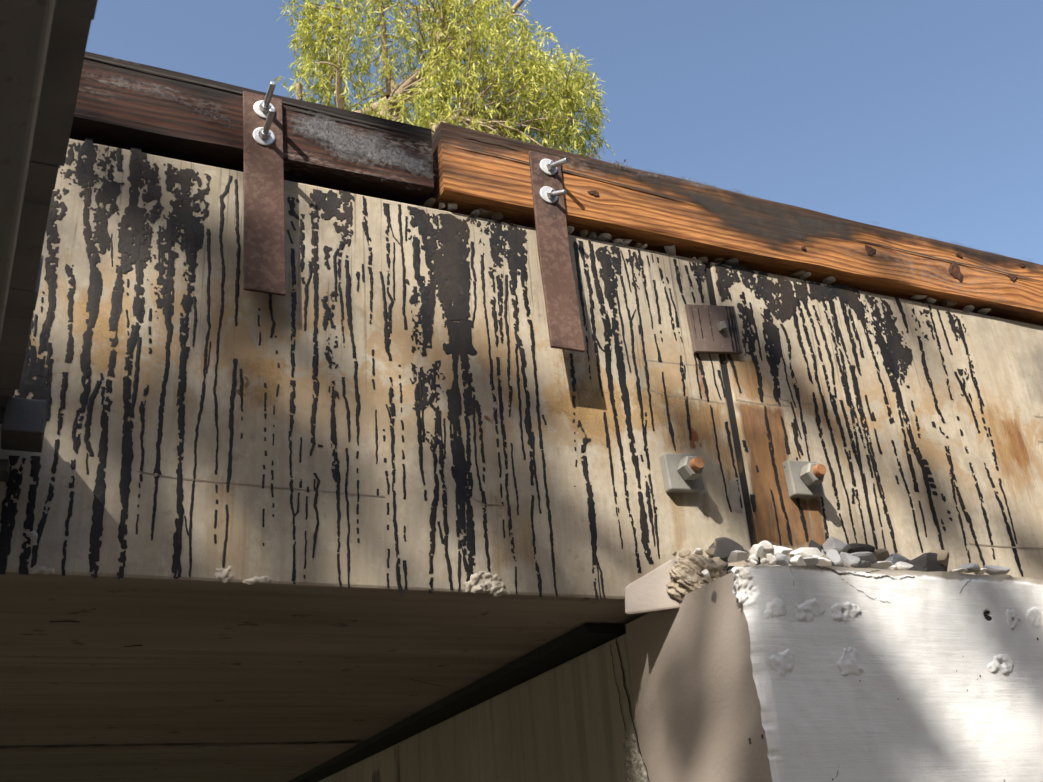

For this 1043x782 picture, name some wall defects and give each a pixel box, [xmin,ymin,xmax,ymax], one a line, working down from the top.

corrosion [677,394,714,448]
corrosion [991,416,1029,479]
spalling [215,565,271,585]
spalling [463,571,510,597]
spalling [666,554,760,609]
crack [610,635,649,782]